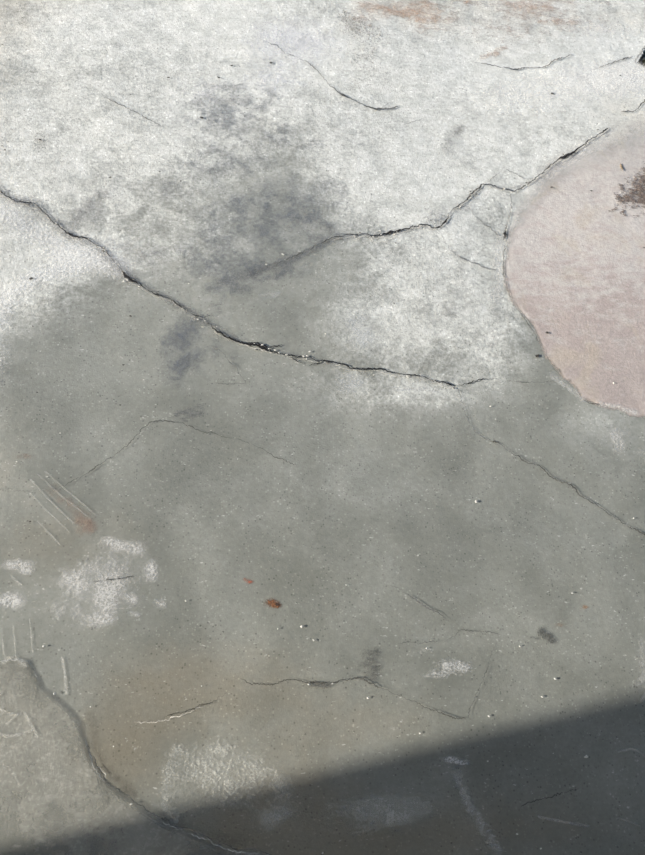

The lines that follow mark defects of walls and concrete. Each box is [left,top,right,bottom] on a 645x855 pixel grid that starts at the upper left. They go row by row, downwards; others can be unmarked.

crack [270,43,401,110]
crack [483,54,570,70]
crack [265,128,608,265]
crack [0,189,494,389]
crack [459,223,557,370]
crack [474,430,645,535]
crack [245,677,382,688]